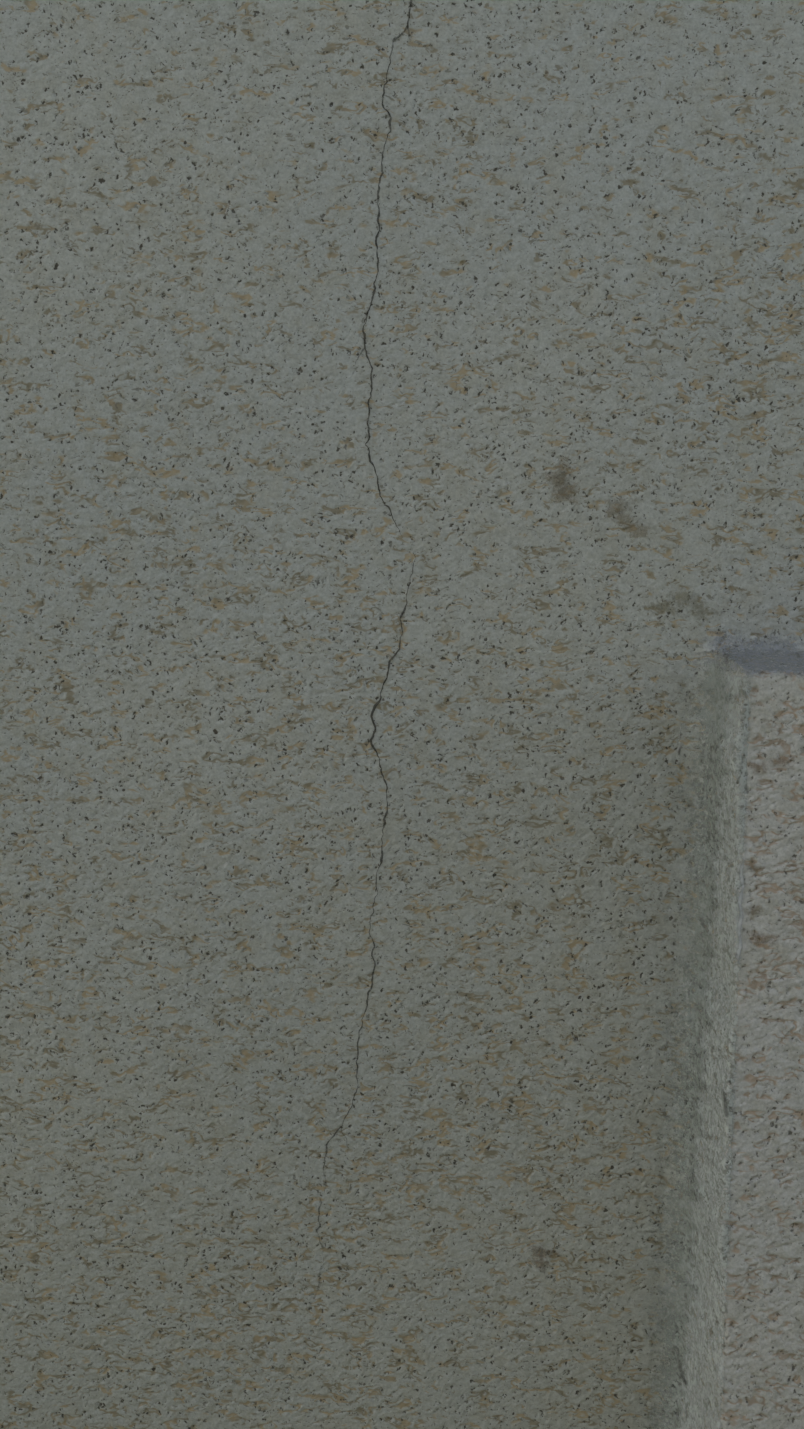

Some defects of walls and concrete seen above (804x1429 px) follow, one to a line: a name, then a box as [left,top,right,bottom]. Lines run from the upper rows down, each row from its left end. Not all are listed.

crack [316,0,416,1244]